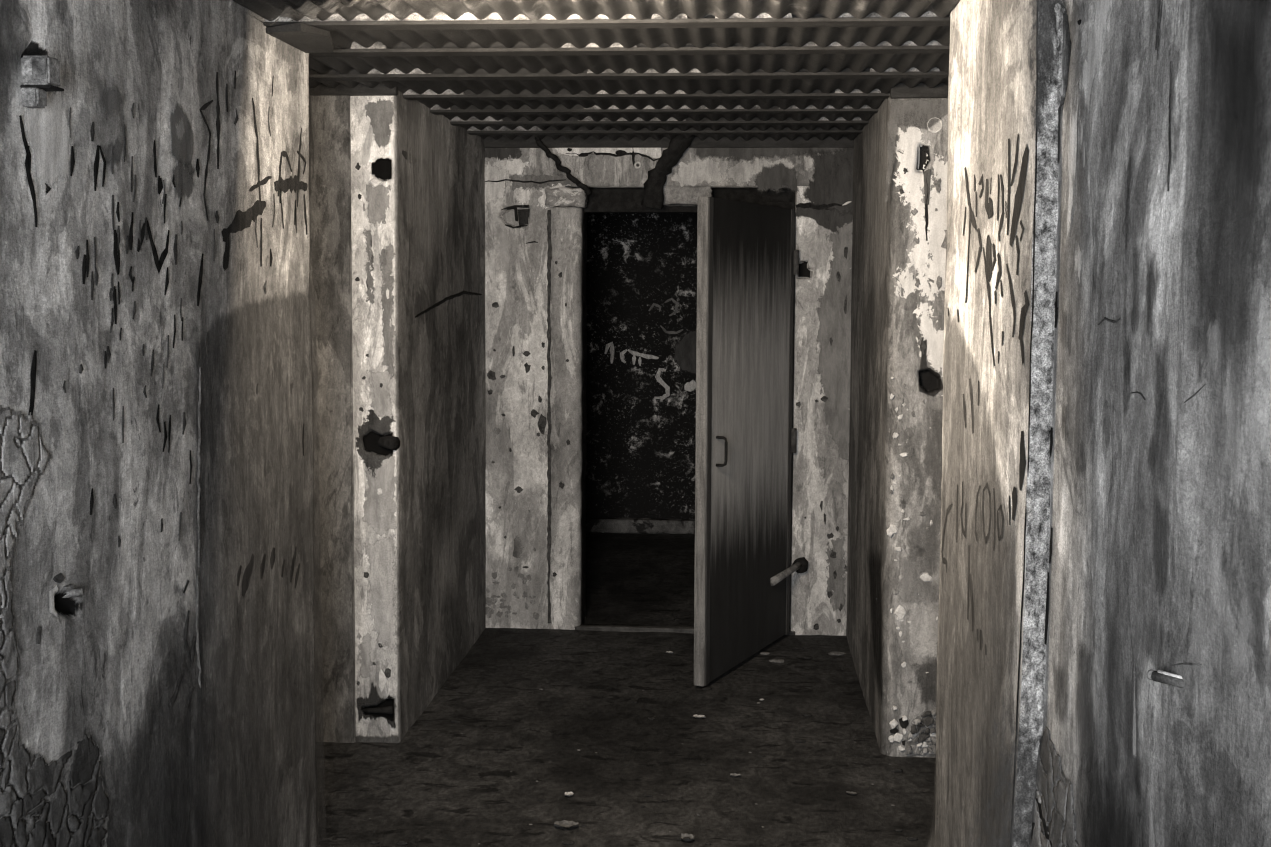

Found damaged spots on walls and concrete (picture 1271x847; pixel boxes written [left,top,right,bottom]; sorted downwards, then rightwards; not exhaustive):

crack [26,350,37,438]
peeling [355,99,400,728]
peeling [886,473,933,683]
peeling [890,126,948,457]